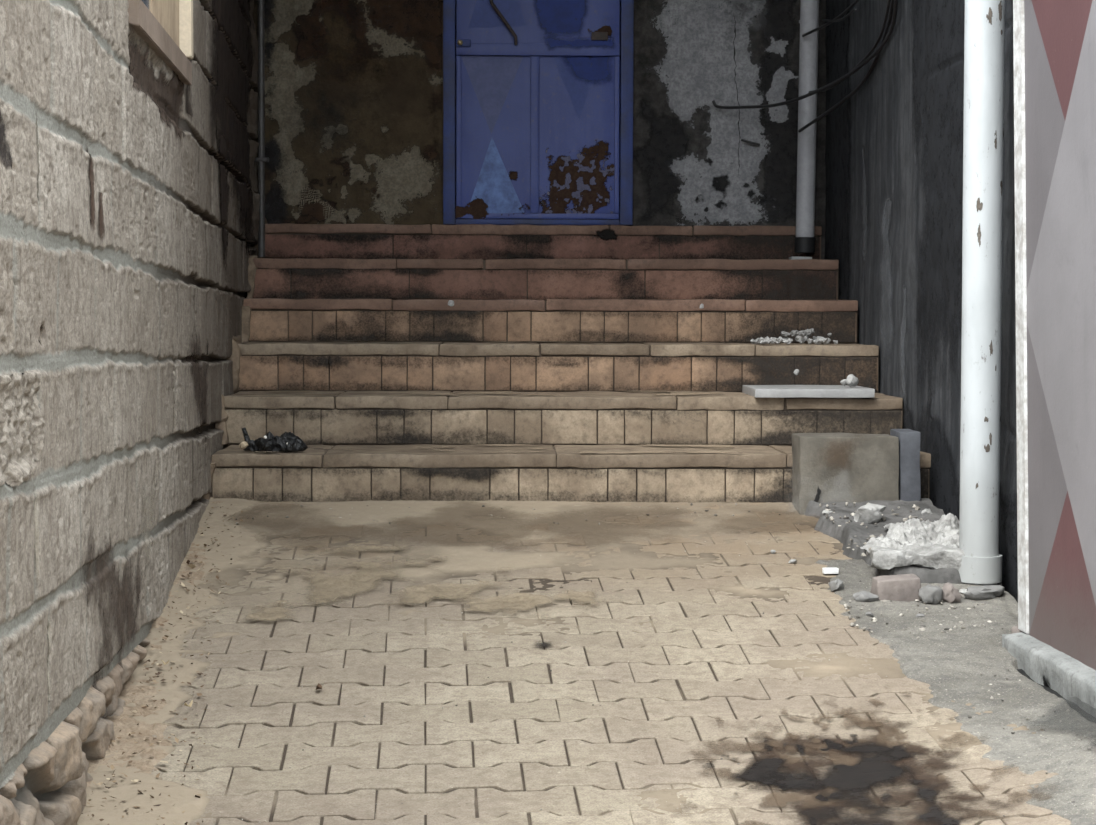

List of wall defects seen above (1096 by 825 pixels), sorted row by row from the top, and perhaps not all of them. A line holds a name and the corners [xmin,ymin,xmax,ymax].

peeling [257,0,442,225]
flaking render [643,0,775,226]
corrosion [455,139,620,219]
damp [185,337,209,438]
damp [733,742,959,825]